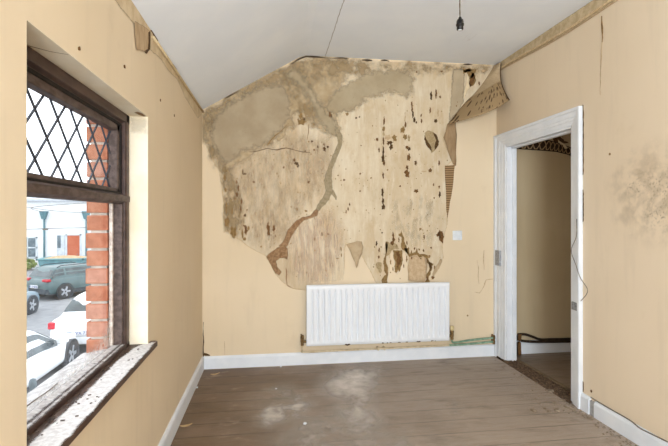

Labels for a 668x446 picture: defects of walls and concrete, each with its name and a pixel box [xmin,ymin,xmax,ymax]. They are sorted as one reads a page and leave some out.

flaking render [116,0,615,290]